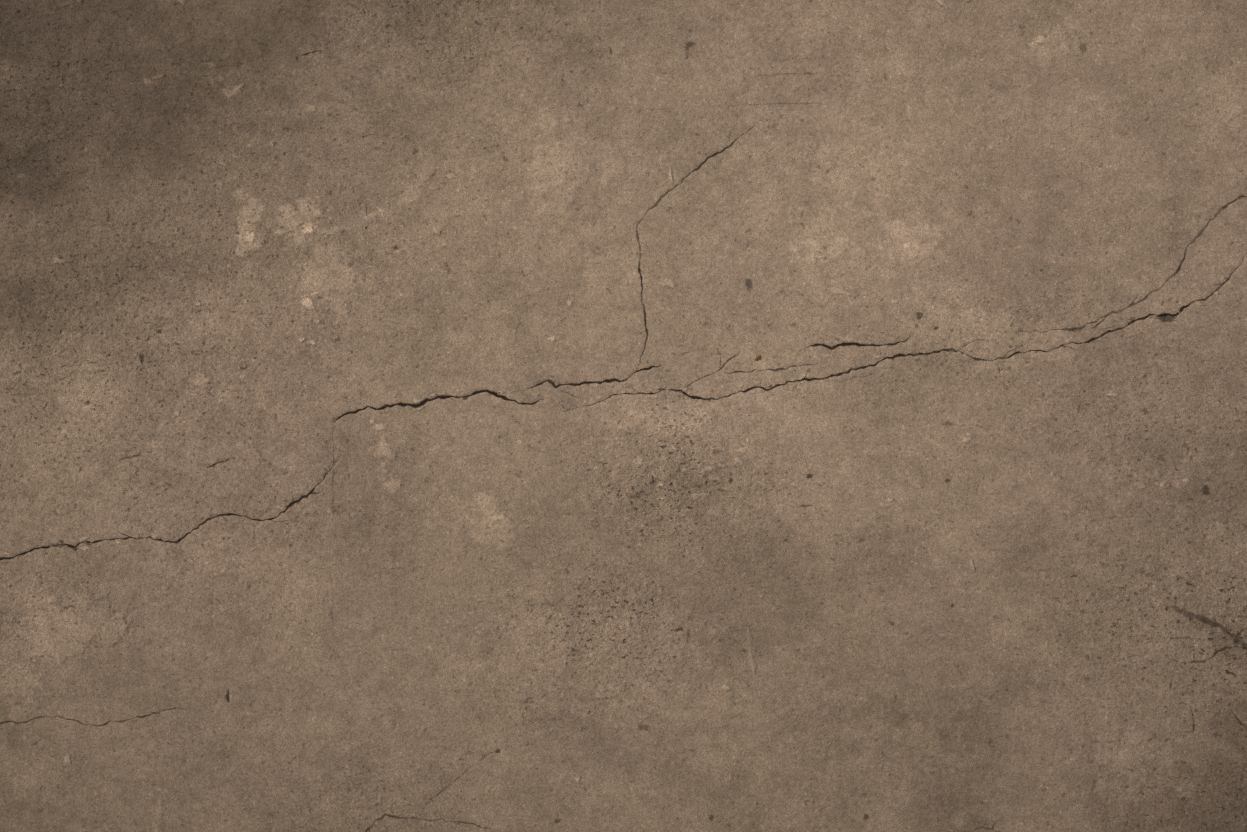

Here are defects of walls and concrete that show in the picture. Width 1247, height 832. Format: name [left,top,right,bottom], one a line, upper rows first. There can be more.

crack [653,127,752,207]
crack [334,254,1246,422]
crack [0,459,338,560]